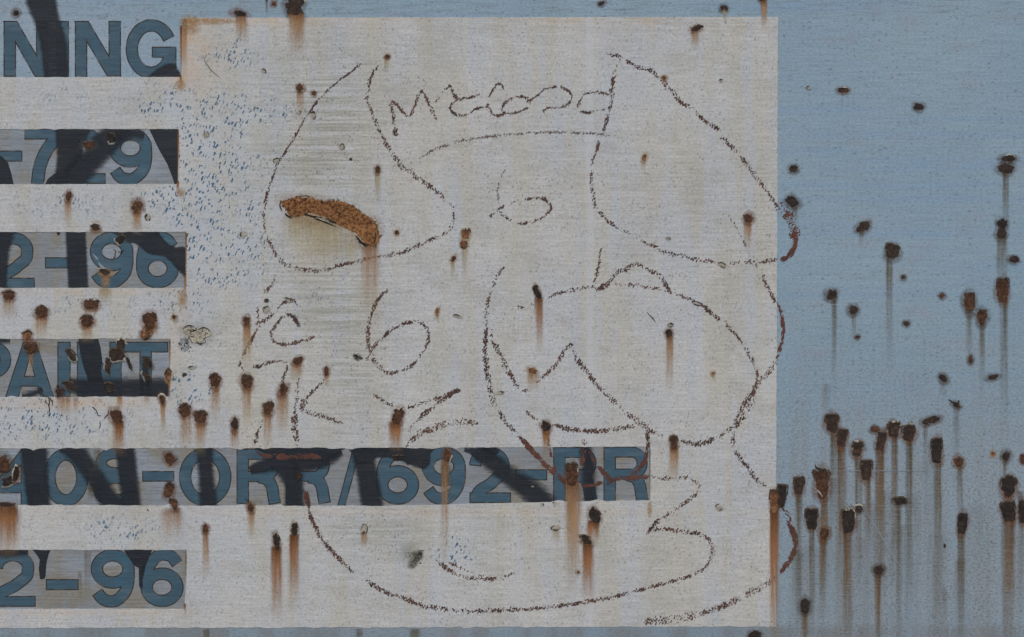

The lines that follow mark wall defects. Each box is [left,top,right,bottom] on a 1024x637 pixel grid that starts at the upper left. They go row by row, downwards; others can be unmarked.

rust [279,195,399,272]
rust [21,304,48,355]
rust [80,268,111,335]
rust [140,312,157,340]
rust [996,277,1010,321]
rust [103,336,153,440]
rust [178,403,208,438]
rust [262,383,288,426]
rust [565,462,601,581]
rust [769,413,964,606]
rust [991,451,1024,589]
rust [272,522,298,591]